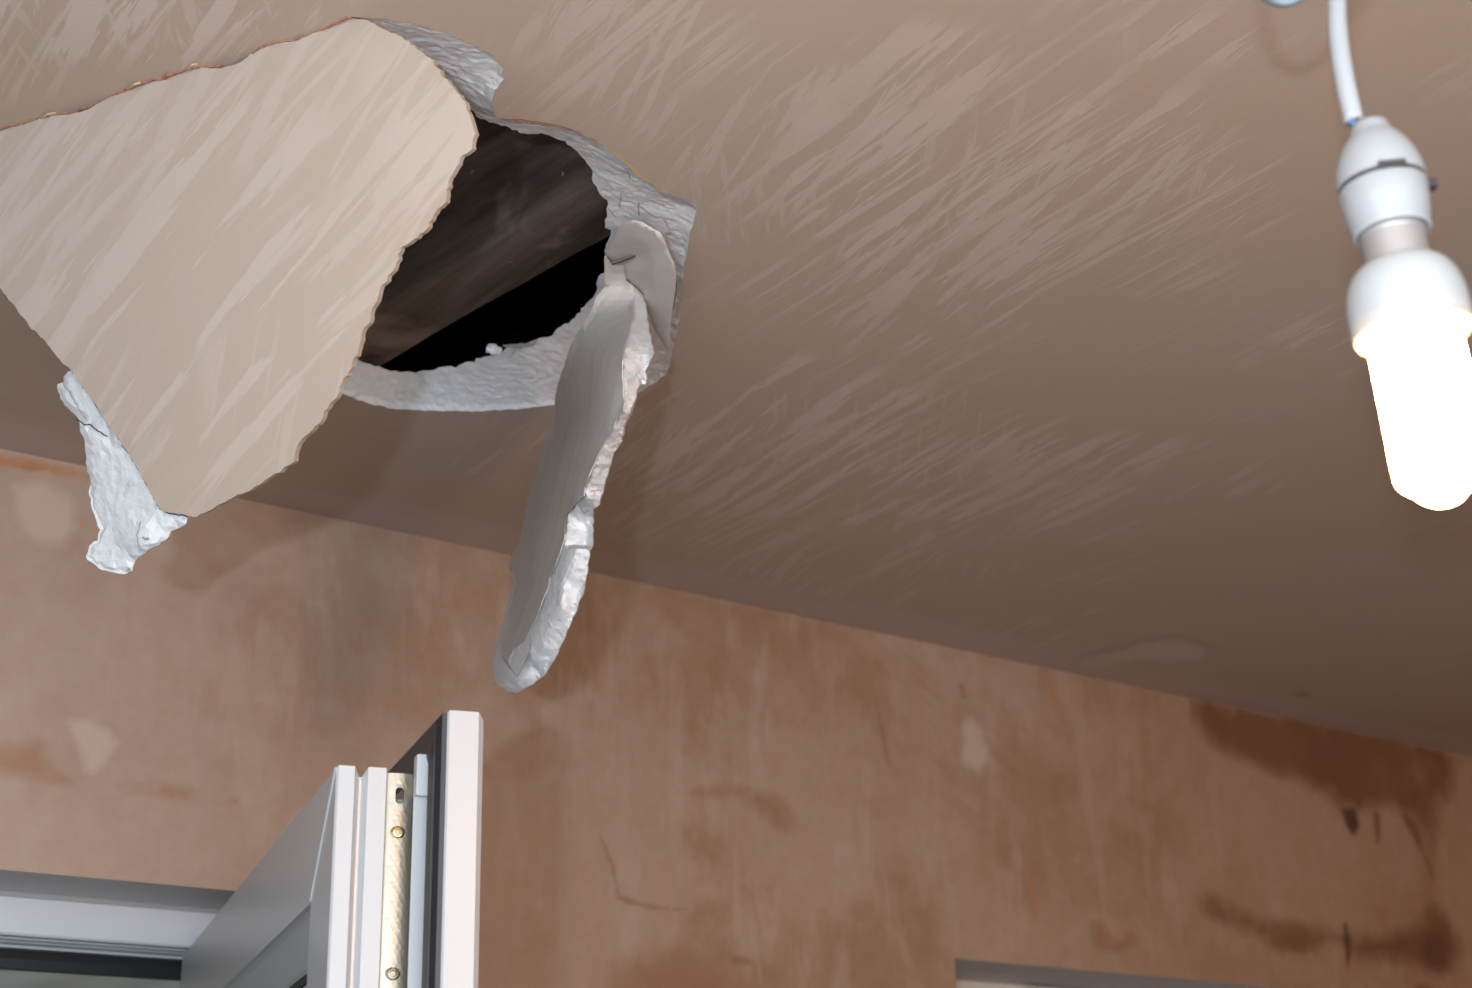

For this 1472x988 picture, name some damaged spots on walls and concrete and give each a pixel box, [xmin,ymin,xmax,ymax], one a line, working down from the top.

peeling [486,343,503,355]
leakage [1180,696,1472,988]